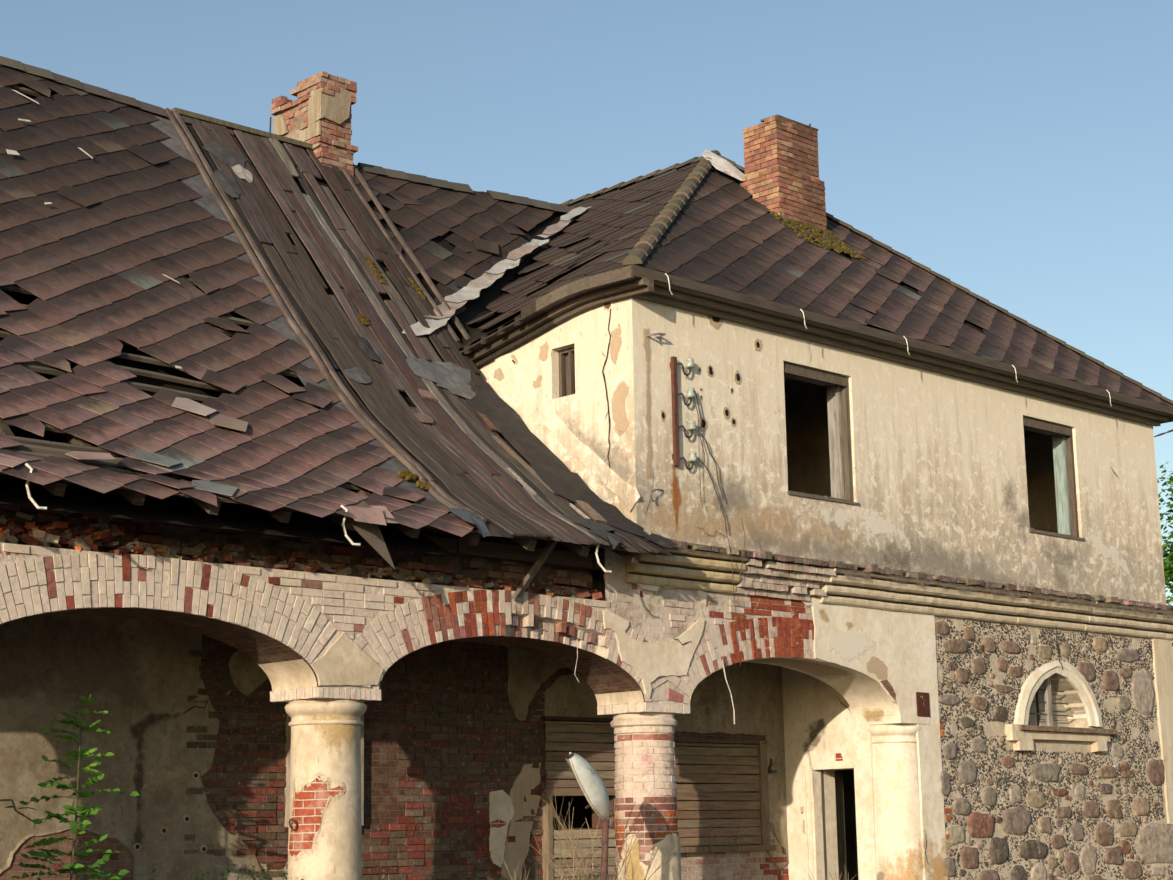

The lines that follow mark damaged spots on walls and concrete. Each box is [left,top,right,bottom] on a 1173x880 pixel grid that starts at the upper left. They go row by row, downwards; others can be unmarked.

crack [601,308,611,469]
flaking render [611,381,629,436]
rust [672,465,681,523]
spalling [0,508,349,613]
flaking render [401,629,414,653]
flaking render [377,566,605,644]
spalling [700,596,828,675]
flaking render [667,688,683,702]
spalling [0,828,142,880]
spalling [288,772,347,861]
flaking render [615,797,679,877]
spalling [680,821,789,880]